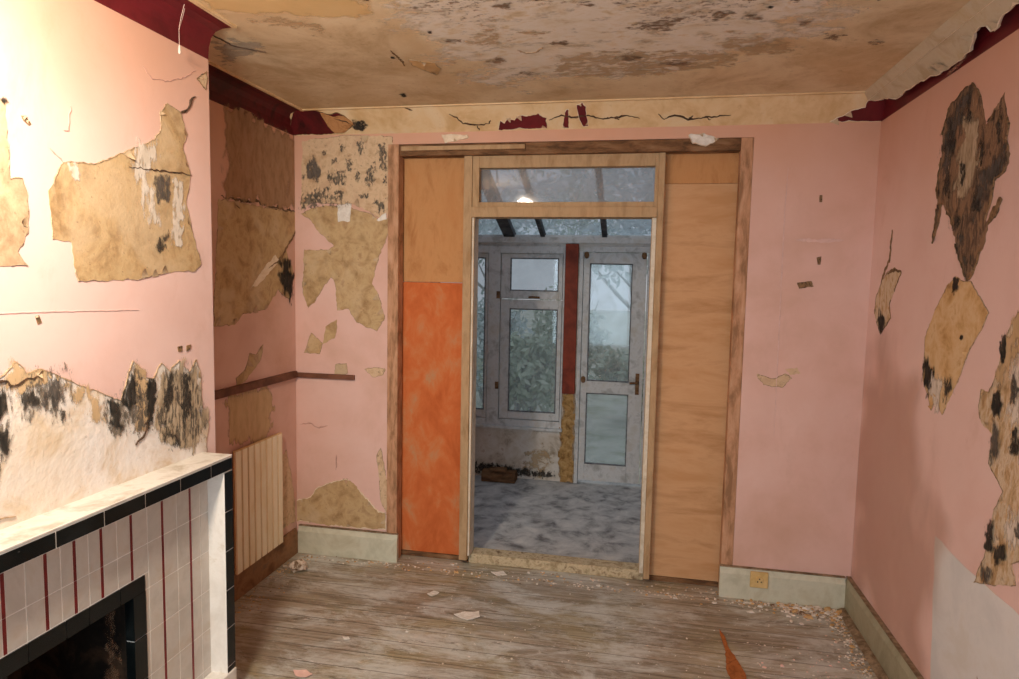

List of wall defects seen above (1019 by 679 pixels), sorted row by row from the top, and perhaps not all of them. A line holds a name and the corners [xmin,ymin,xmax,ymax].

water stain [410,0,514,24]
peeling [384,0,858,92]
water stain [615,0,762,32]
crack [449,114,491,130]
crack [550,113,730,121]
peeling [48,71,208,282]
peeling [213,199,388,354]
peeling [922,82,1011,415]
water stain [0,362,75,472]
peeling [0,349,209,530]
water stain [101,362,207,455]
water stain [225,386,275,445]